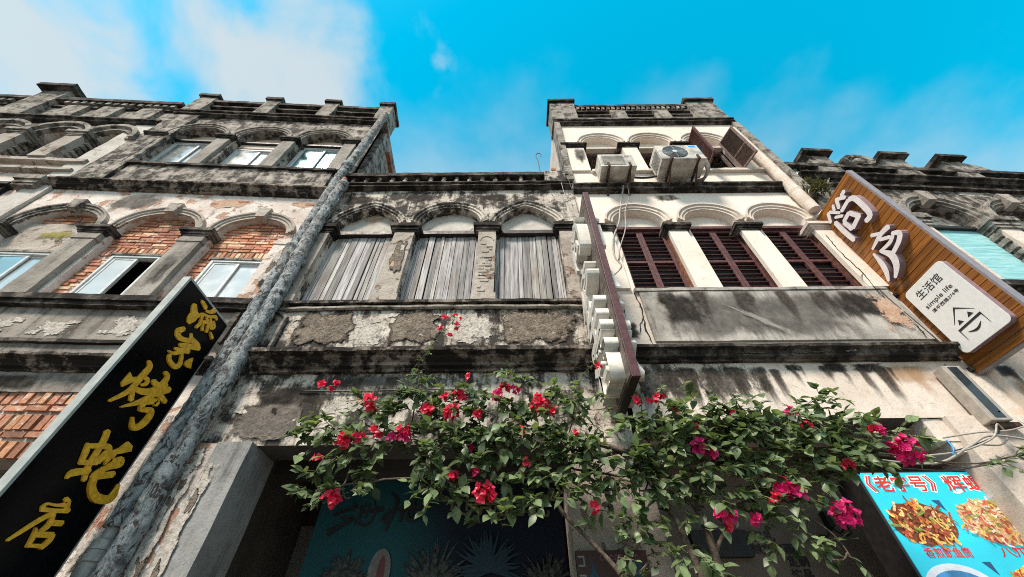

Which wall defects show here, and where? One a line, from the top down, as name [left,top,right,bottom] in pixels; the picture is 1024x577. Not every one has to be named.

leakage [405,194,433,204]
peeling [0,316,81,337]
peeling [97,316,144,337]
flaking render [290,309,441,346]
flaking render [453,309,576,345]
leakage [655,290,886,337]
peeling [865,293,918,330]
leakage [639,364,803,403]
leakage [818,363,901,395]
flaking render [60,415,176,577]
peeling [124,432,220,577]